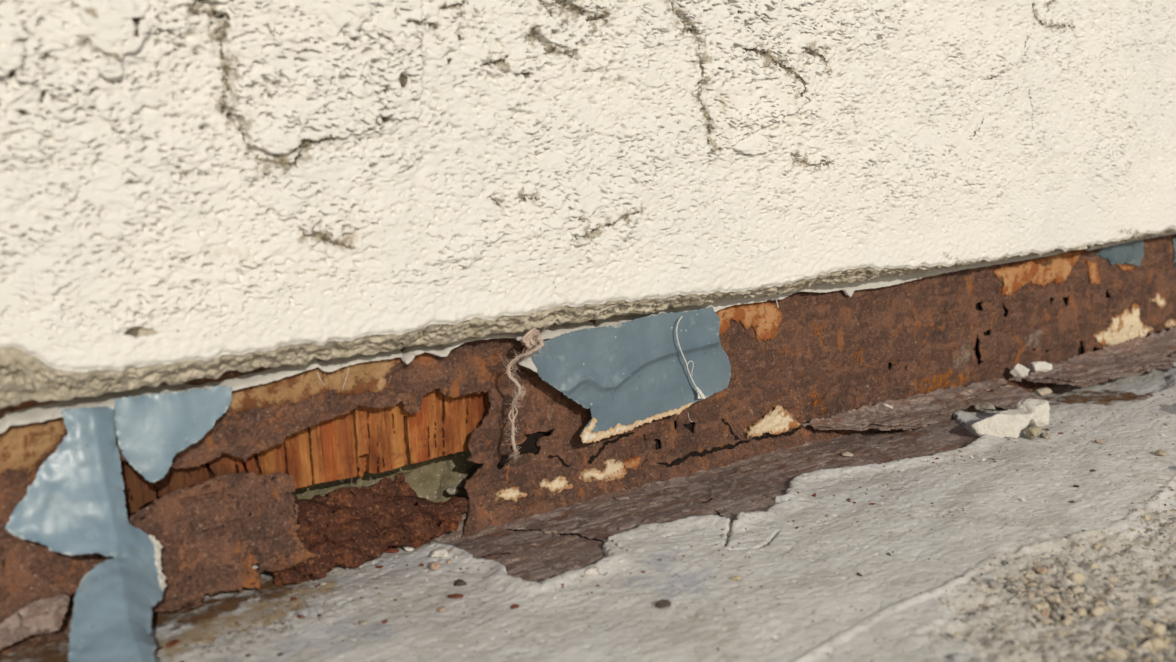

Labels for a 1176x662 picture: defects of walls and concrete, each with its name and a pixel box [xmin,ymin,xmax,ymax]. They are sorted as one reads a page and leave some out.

crack [187,4,344,175]
crack [666,0,721,152]
crack [744,43,832,92]
crack [299,221,352,249]
peeling [0,228,1176,662]
rust [1042,390,1152,405]